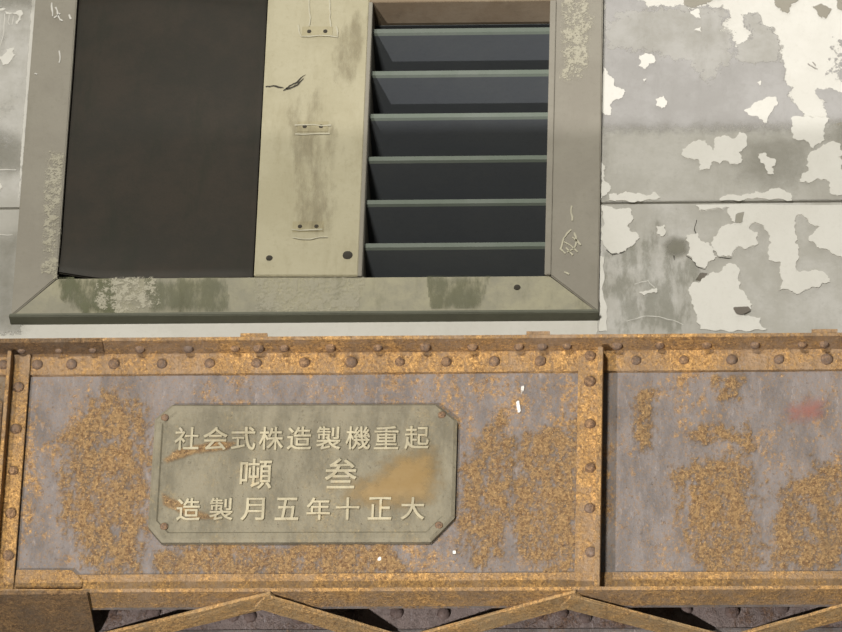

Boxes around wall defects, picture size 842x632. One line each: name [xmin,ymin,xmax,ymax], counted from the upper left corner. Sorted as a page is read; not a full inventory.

crack [266,75,304,91]
peeling [0,0,32,336]
peeling [596,0,842,334]
rust [46,388,412,575]
rust [351,455,434,506]
rust [455,408,577,573]
rust [629,388,657,452]
rust [669,420,842,572]